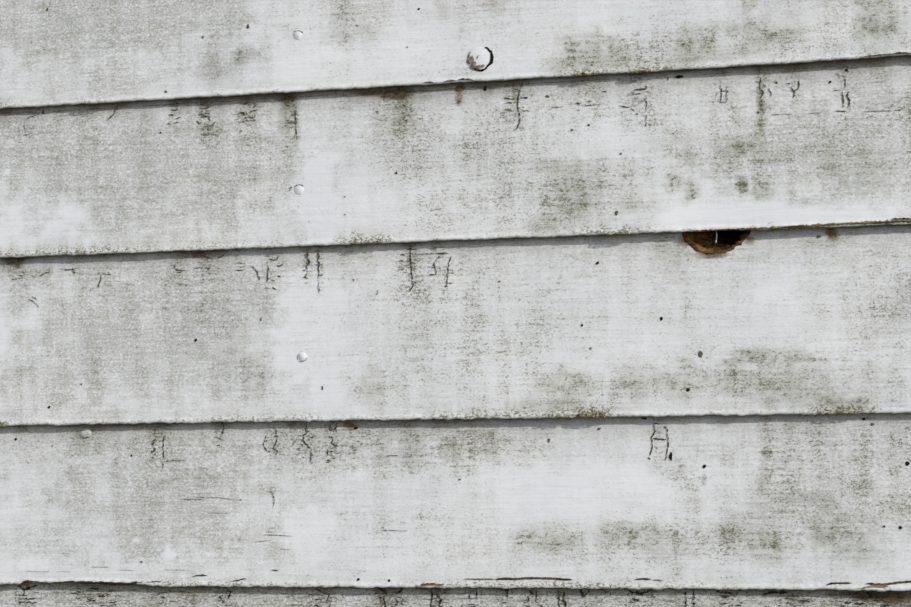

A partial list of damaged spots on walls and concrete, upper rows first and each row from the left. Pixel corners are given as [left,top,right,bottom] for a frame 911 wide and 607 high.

mould [560,28,632,73]
crack [756,66,911,115]
crack [146,95,323,139]
mould [556,170,597,207]
crack [399,246,453,292]
damp [712,350,799,393]
crack [150,428,182,469]
crack [263,422,359,463]
crack [648,423,669,460]